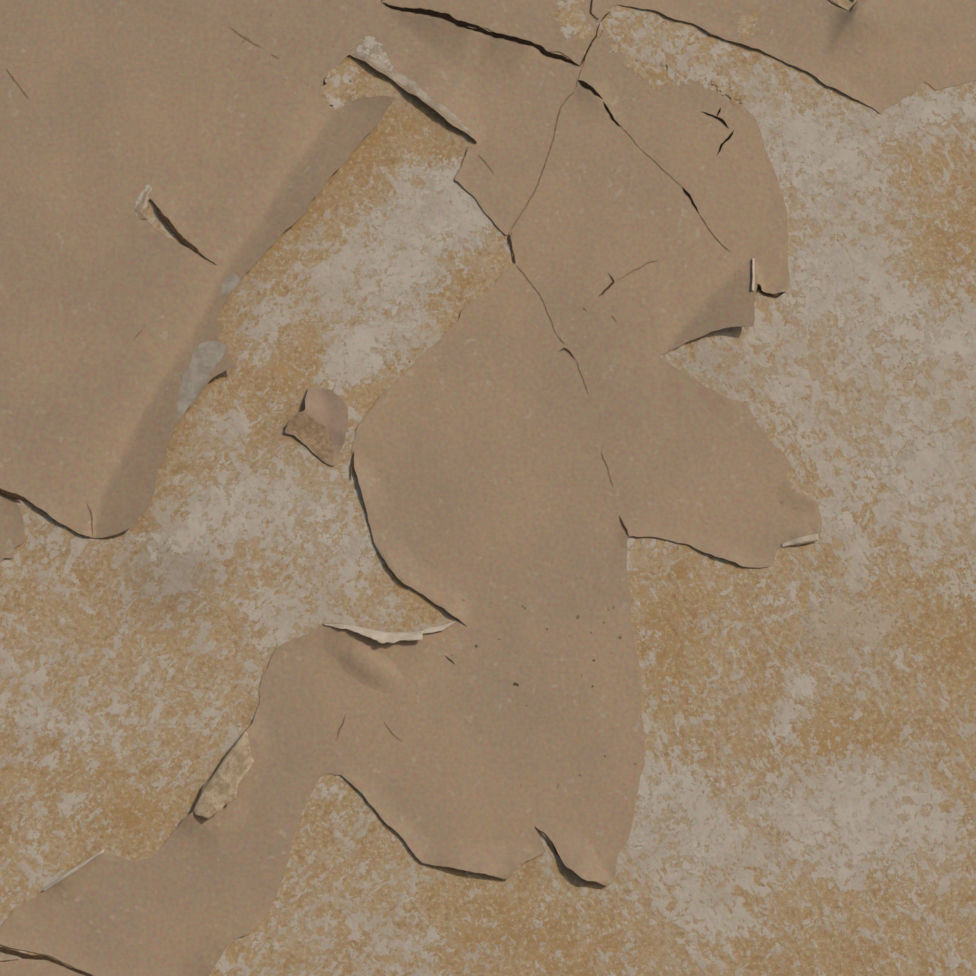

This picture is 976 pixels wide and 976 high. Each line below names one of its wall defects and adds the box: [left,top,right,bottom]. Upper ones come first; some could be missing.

peeling [383,0,976,113]
crack [704,108,734,155]
crack [381,0,729,394]
crack [155,205,216,265]
peeling [0,0,580,538]
peeling [0,496,25,563]
peeling [781,534,819,547]
peeling [324,624,423,644]
peeling [421,621,456,634]
peeling [193,731,254,819]
peeling [0,953,85,976]